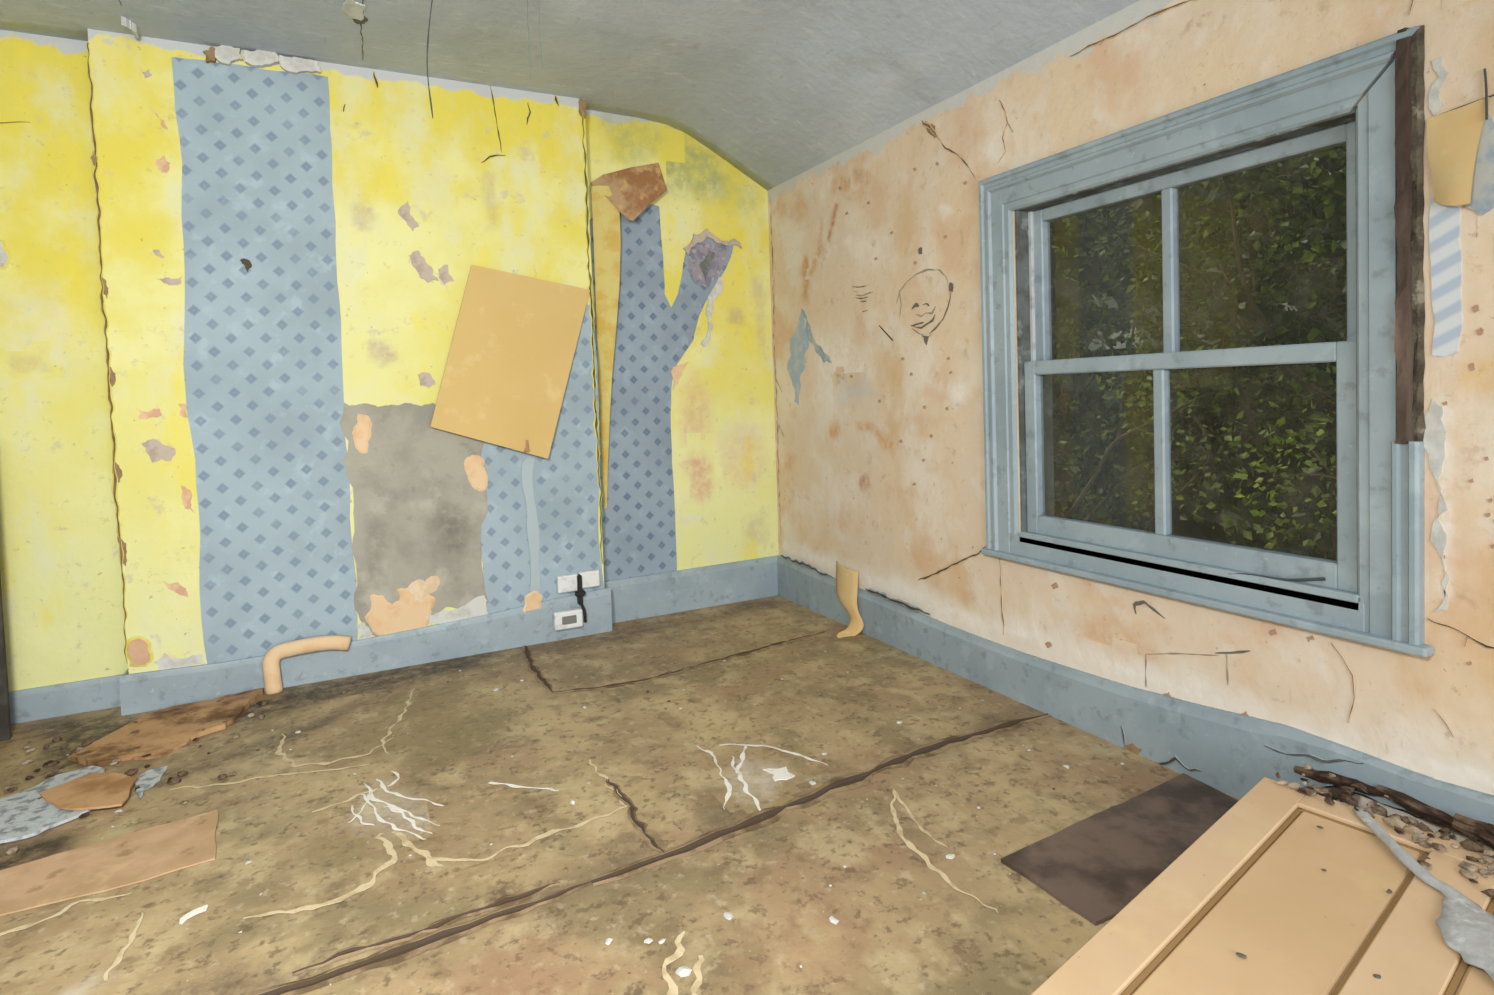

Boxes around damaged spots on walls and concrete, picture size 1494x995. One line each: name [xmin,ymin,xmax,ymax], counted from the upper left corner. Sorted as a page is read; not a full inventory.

crack [359,0,379,88]
crack [1069,0,1191,57]
peeling [1428,57,1448,116]
peeling [342,195,419,243]
peeling [0,240,11,270]
peeling [409,250,454,286]
peeling [787,305,913,431]
flaking render [339,332,489,640]
peeling [1423,360,1474,612]
crack [522,629,831,693]
crack [1428,618,1494,649]
crack [135,695,1075,995]